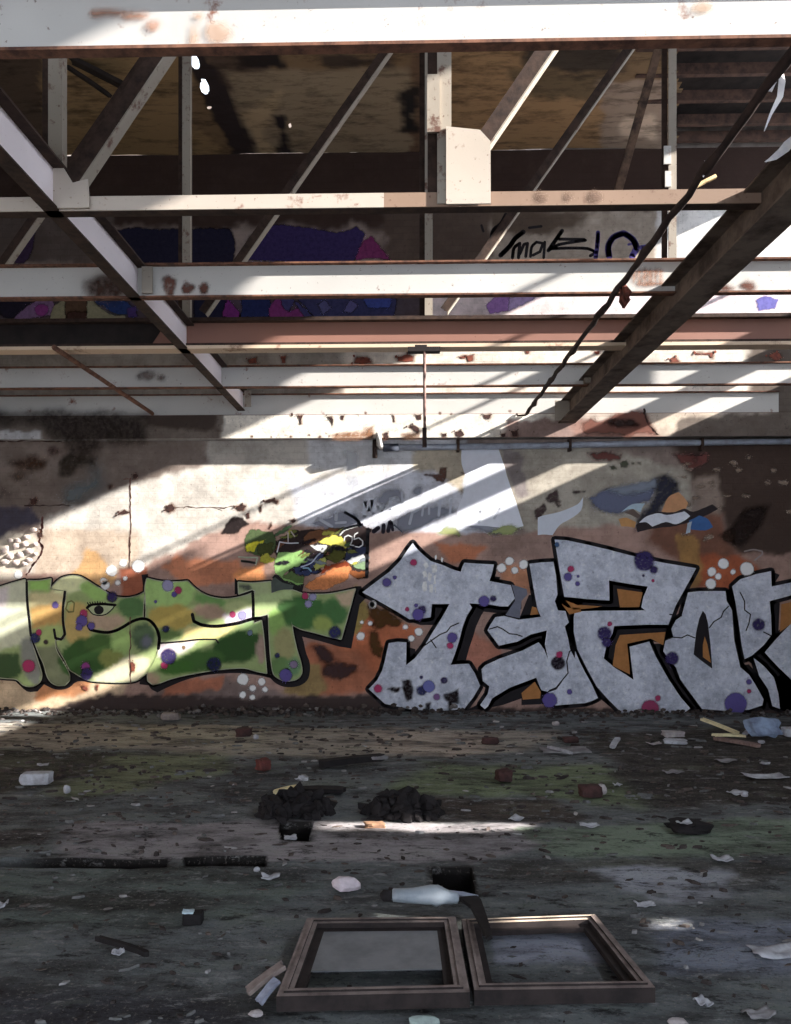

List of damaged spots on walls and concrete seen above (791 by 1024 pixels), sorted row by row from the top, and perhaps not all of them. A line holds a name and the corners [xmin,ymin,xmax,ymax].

rust [91,10,158,30]
rust [163,276,208,295]
rust [309,427,373,438]
peeling [674,453,751,507]
crack [175,504,237,512]
peeling [534,490,561,519]
crack [123,478,132,569]
crack [126,617,134,685]